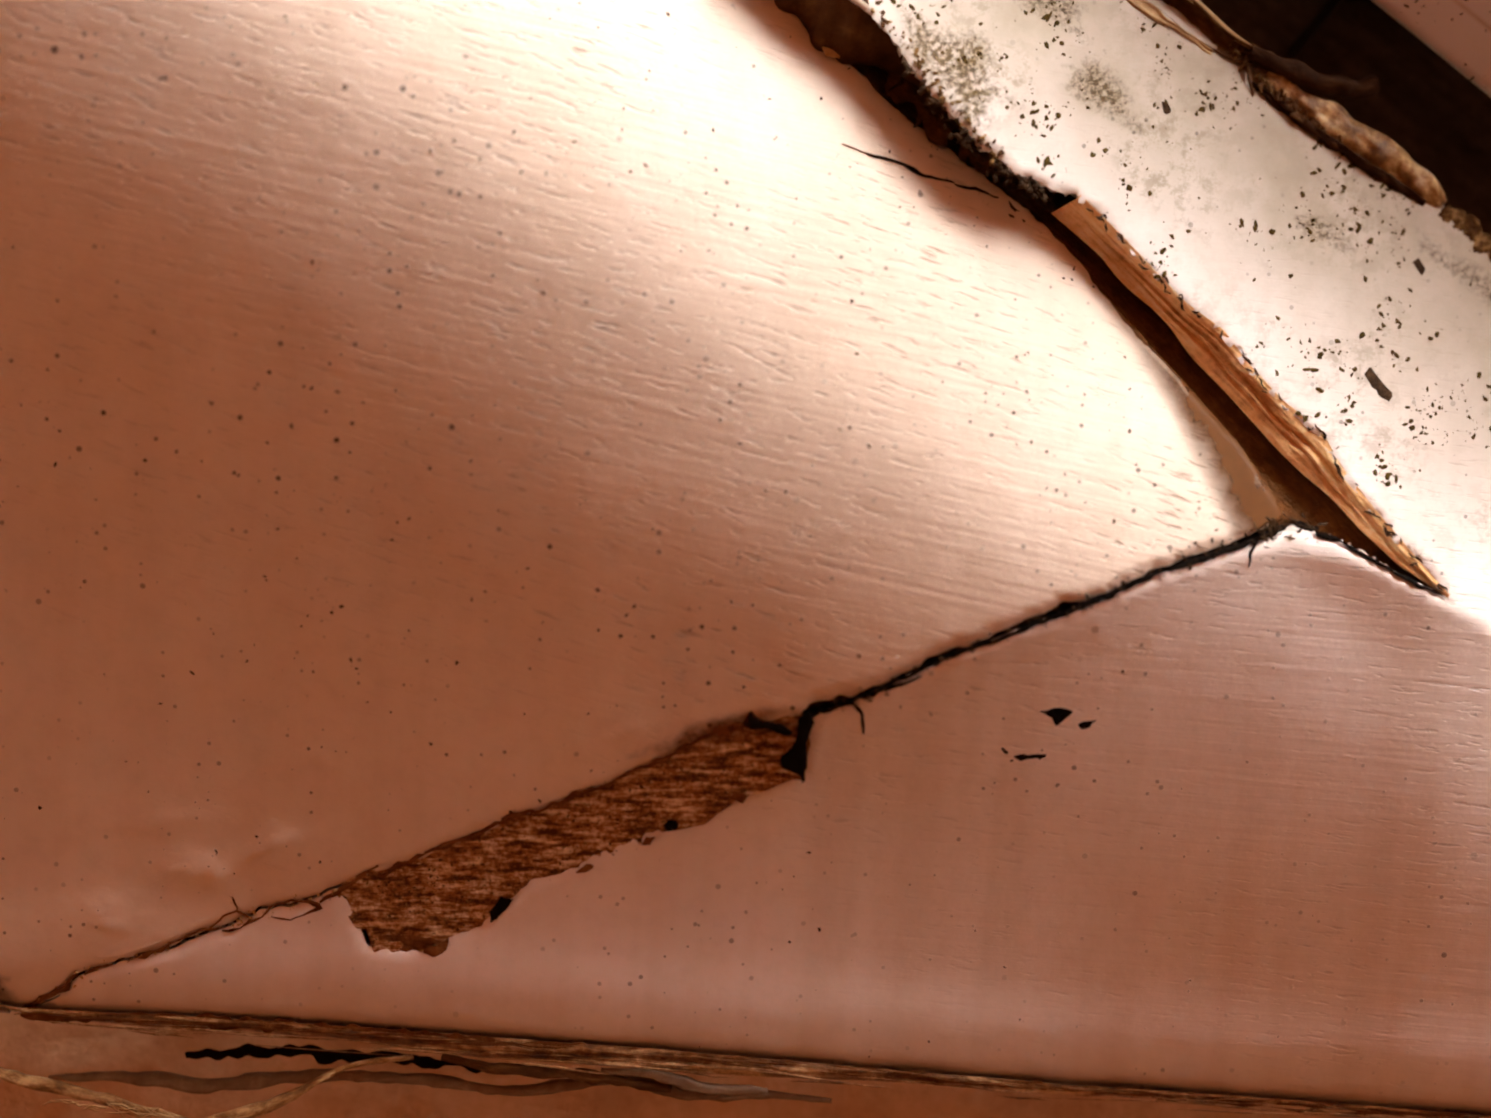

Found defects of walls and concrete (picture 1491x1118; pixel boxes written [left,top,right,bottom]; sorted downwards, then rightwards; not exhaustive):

peeling [1127,0,1491,262]
crack [796,0,1450,734]
peeling [1412,258,1425,275]
crack [21,865,379,1008]
peeling [331,710,814,957]